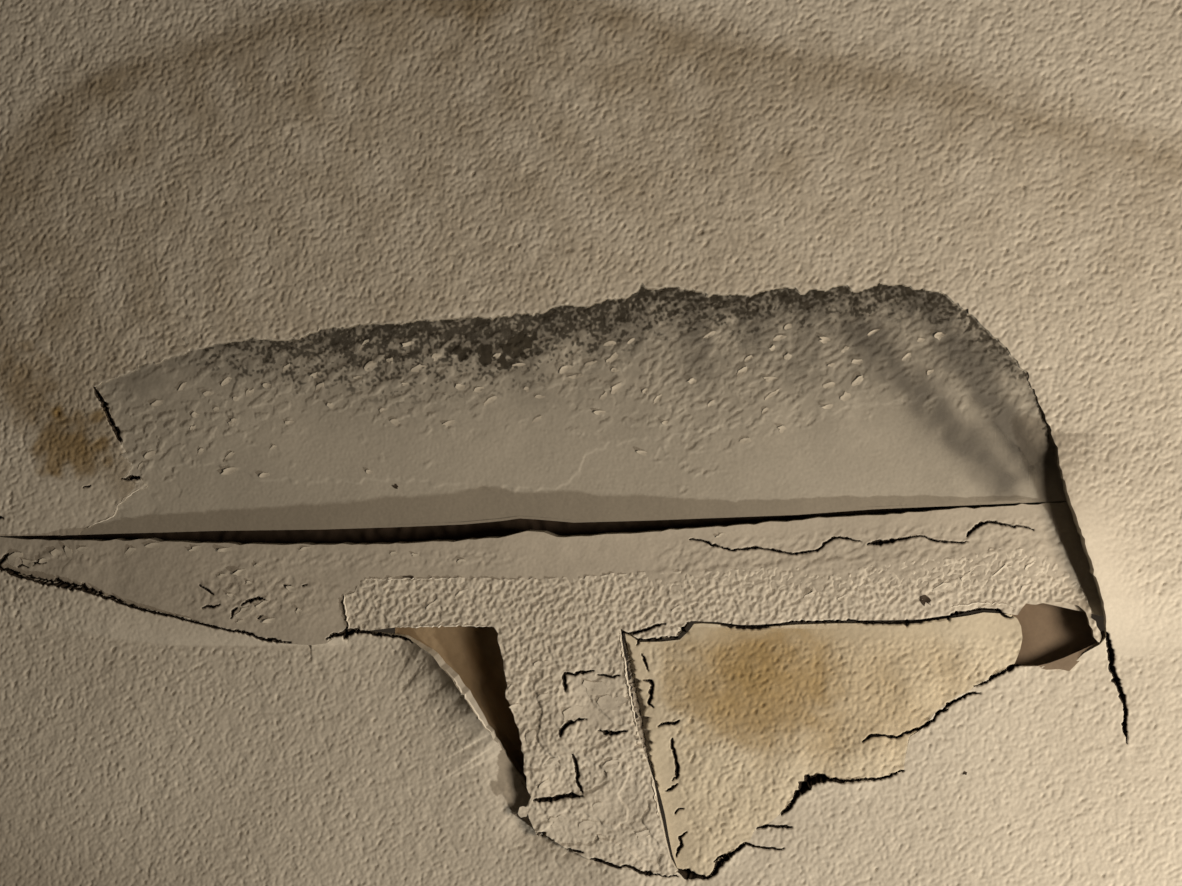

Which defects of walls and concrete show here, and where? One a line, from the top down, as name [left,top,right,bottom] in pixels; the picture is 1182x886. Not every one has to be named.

crack [94,387,122,442]
crack [0,501,1061,643]
peeling [0,281,1104,877]
crack [534,623,904,880]
crack [862,664,1021,743]
crack [1106,632,1128,744]